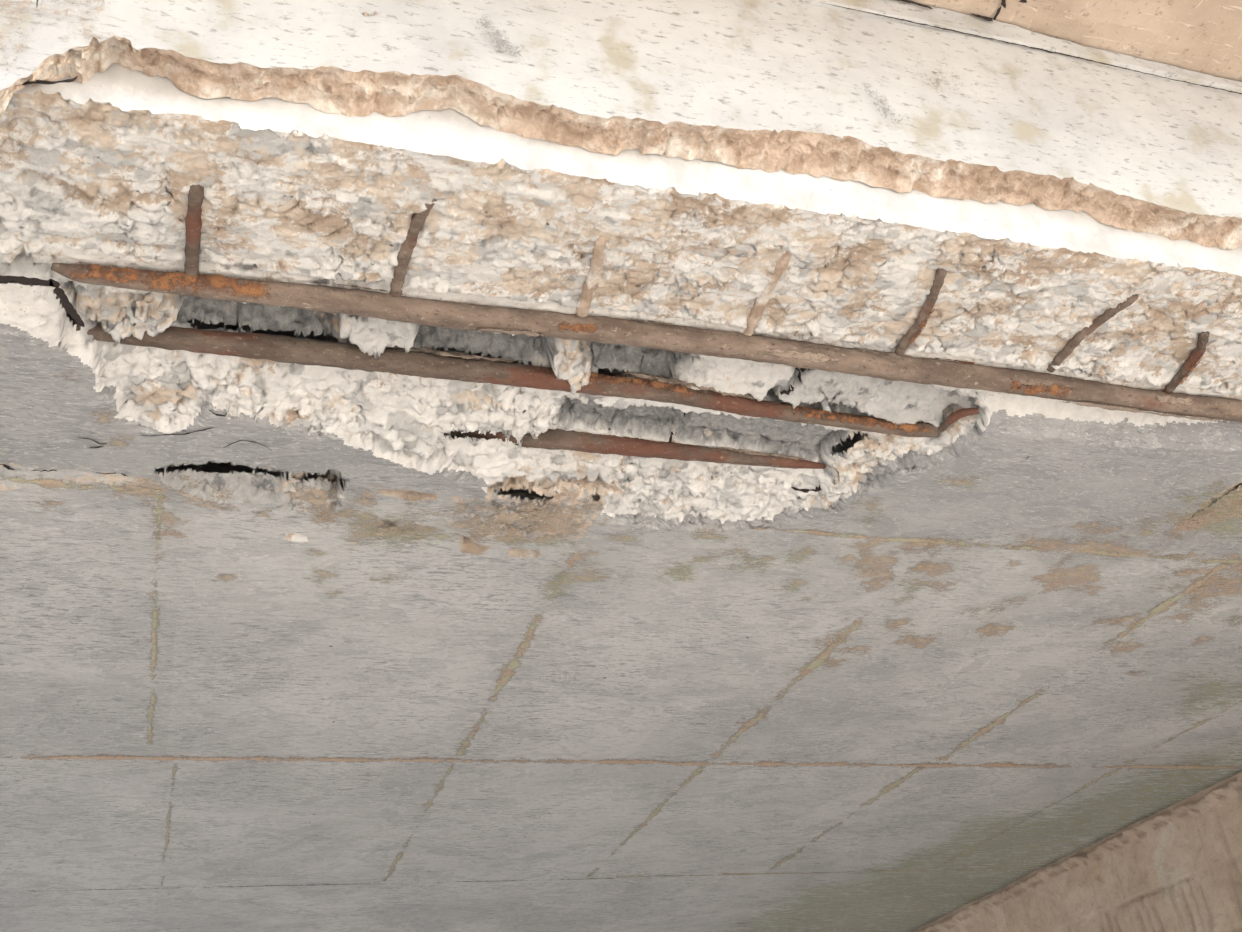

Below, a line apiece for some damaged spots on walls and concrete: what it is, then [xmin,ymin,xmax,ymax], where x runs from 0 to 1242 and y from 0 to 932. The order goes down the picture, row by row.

crack [811,0,1242,94]
crack [0,275,85,327]
spalling [0,0,1242,558]